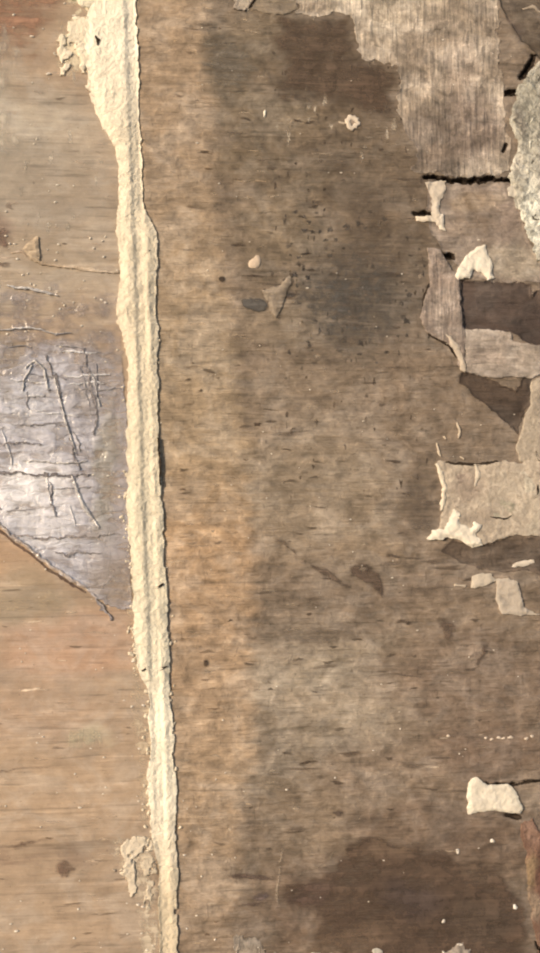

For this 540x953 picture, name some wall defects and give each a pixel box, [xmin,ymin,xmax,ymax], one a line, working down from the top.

damp [275,17,394,112]
peeling [339,115,361,131]
crack [423,174,510,185]
peeling [416,180,446,231]
peeling [455,245,494,281]
peeling [454,573,540,616]
peeling [466,777,523,814]
spalling [57,861,73,877]
damp [284,837,527,953]
peeling [445,944,471,953]